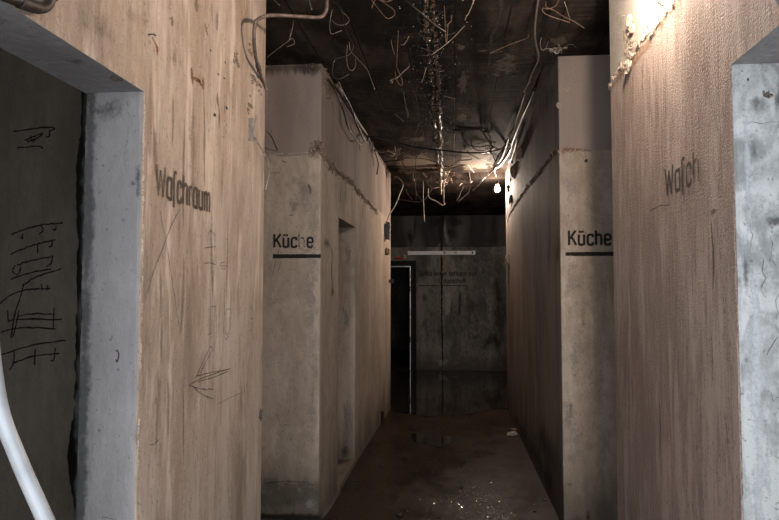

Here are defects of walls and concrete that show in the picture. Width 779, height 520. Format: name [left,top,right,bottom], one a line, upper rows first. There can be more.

peeling [612,0,673,81]
crack [748,175,779,355]